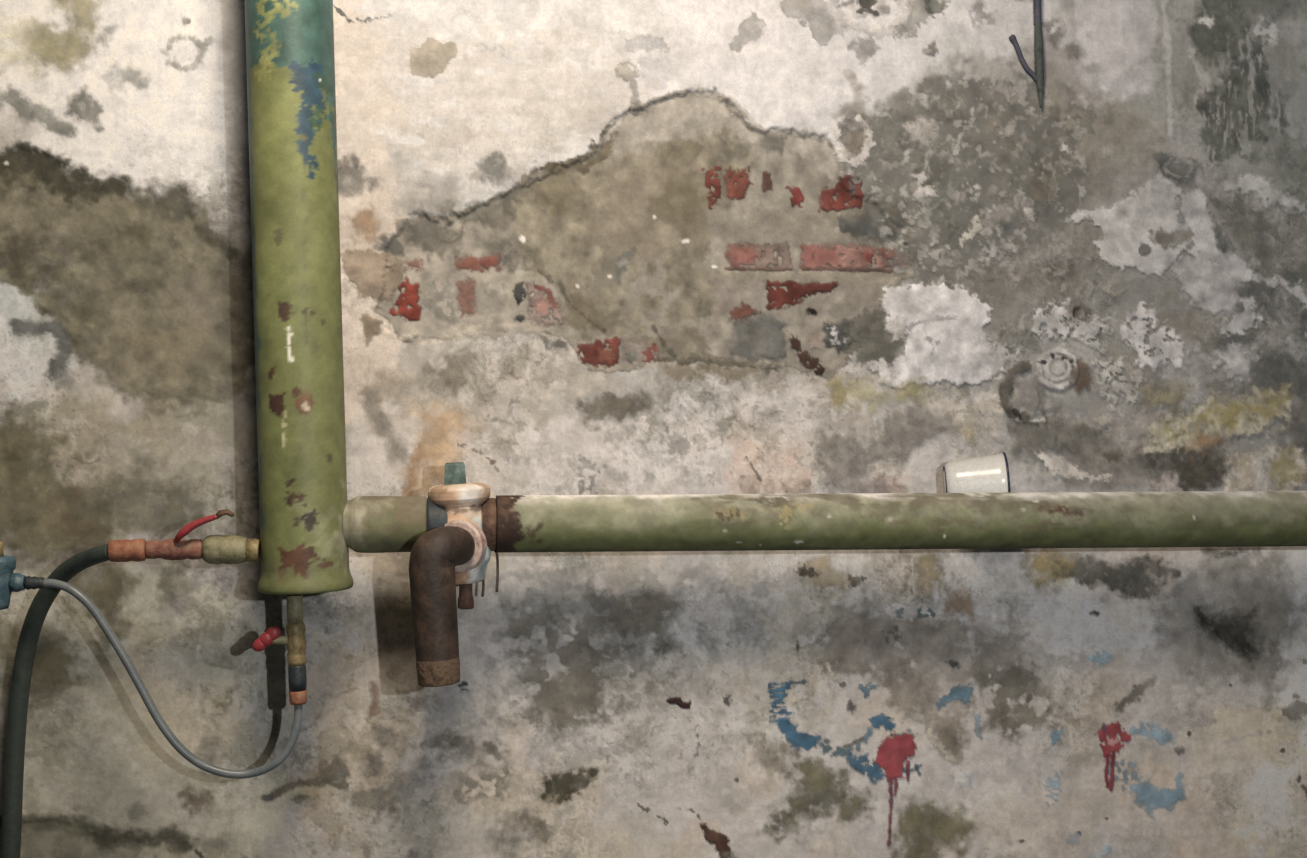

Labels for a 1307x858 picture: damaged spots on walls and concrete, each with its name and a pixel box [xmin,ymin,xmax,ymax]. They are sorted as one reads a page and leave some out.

water stain [1189,0,1289,162]
water stain [0,143,255,413]
spalling [343,72,1307,410]
water stain [1210,198,1279,267]
water stain [1235,272,1307,332]
water stain [817,380,973,493]
water stain [1007,329,1307,492]